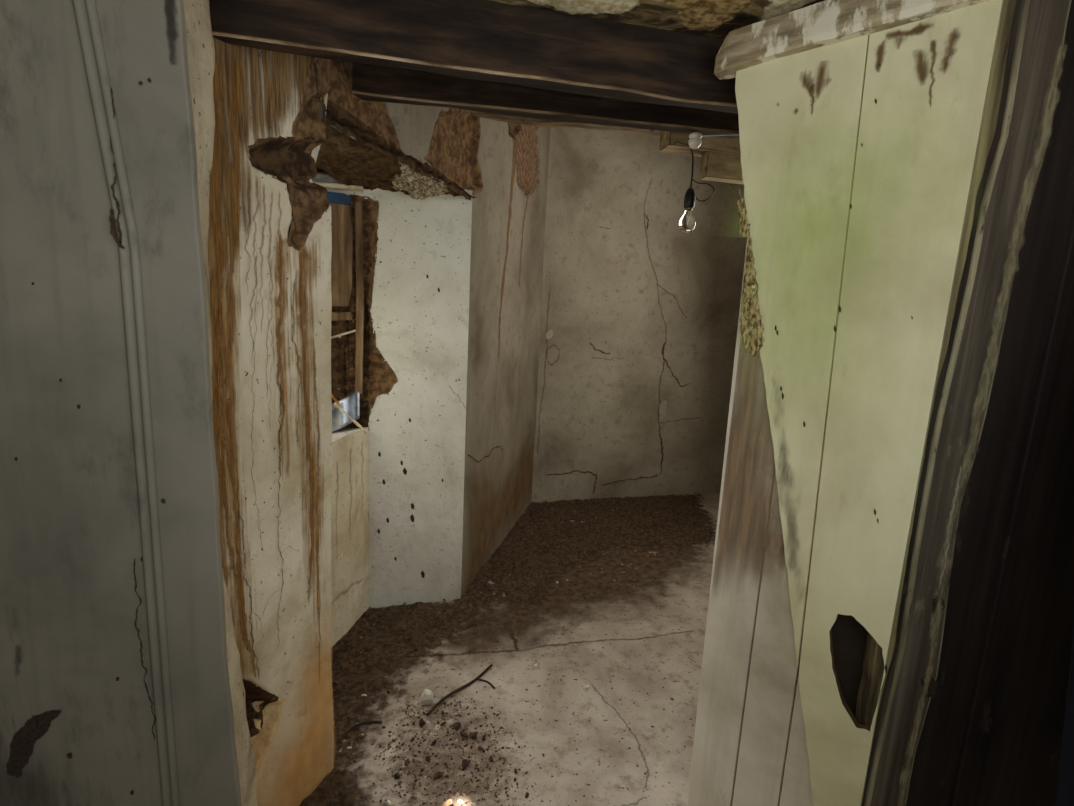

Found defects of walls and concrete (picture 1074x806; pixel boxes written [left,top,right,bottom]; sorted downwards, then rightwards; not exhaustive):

peeling [528,0,639,15]
peeling [665,0,815,31]
leakage [803,66,824,113]
leakage [876,24,929,71]
leakage [918,31,958,106]
flaking render [247,57,483,432]
corrosion [498,127,517,358]
corrosion [208,58,256,677]
corrosion [275,235,323,679]
crack [549,342,701,493]
crack [133,558,156,740]
flaking render [243,679,286,775]